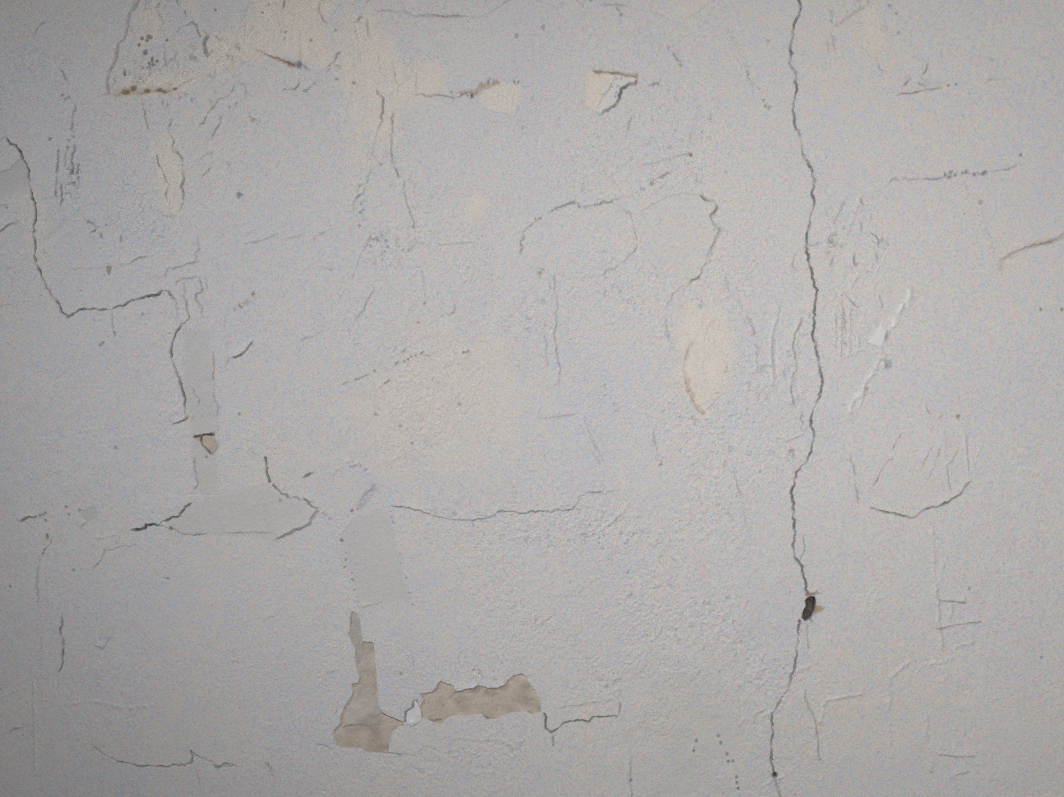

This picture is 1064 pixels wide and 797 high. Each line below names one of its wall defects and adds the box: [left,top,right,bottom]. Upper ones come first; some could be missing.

peeling [103,0,205,101]
peeling [411,79,523,118]
flaking render [584,67,642,133]
crack [0,134,208,425]
crack [682,0,826,797]
crack [90,455,223,581]
crack [235,447,344,543]
crack [387,489,634,535]
peeling [313,611,543,758]
crack [91,744,275,791]